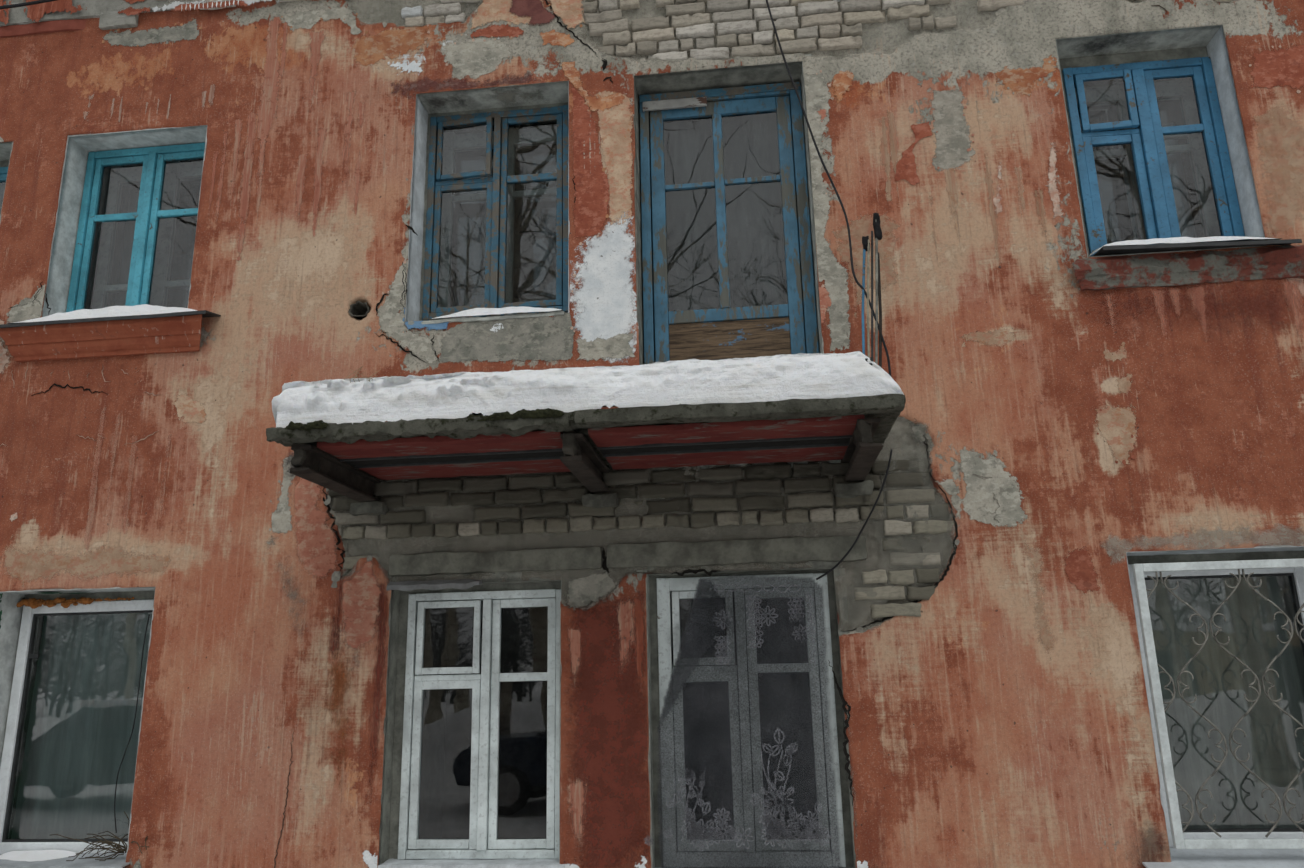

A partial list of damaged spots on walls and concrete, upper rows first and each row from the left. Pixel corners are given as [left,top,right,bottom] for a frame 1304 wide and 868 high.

peeling [102,0,160,43]
peeling [995,55,1057,96]
peeling [895,89,975,185]
flaking render [275,0,956,363]
peeling [1045,142,1063,218]
crack [31,383,107,396]
flaking render [322,459,968,632]
peeling [362,850,378,868]